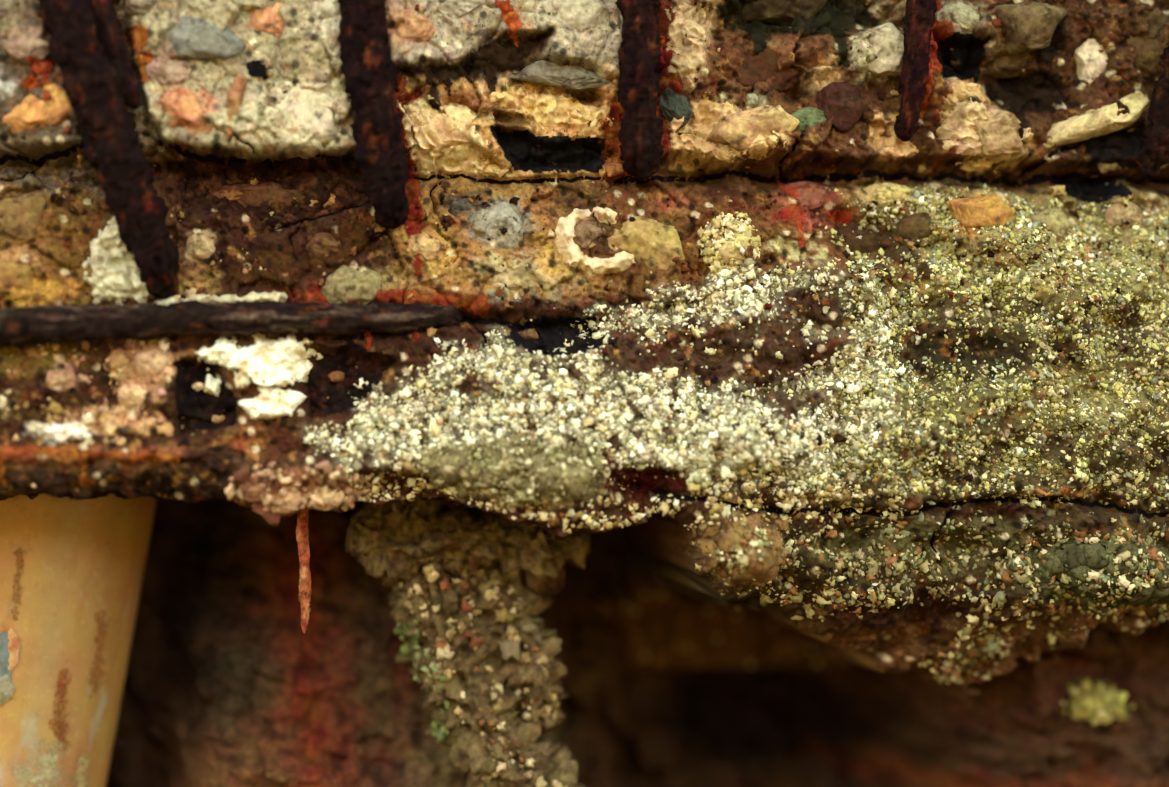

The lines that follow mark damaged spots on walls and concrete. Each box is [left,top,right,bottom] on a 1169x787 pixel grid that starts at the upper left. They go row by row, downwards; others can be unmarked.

rust [125,22,154,83]
rust [655,0,683,156]
spalling [482,125,624,178]
rust [598,87,627,183]
leakage [82,217,288,305]
rust [349,253,491,316]
spalling [555,207,636,276]
spalling [510,315,605,357]
spalling [172,359,236,431]
leakage [195,333,323,419]
spalling [307,341,396,417]
rust [0,443,181,488]